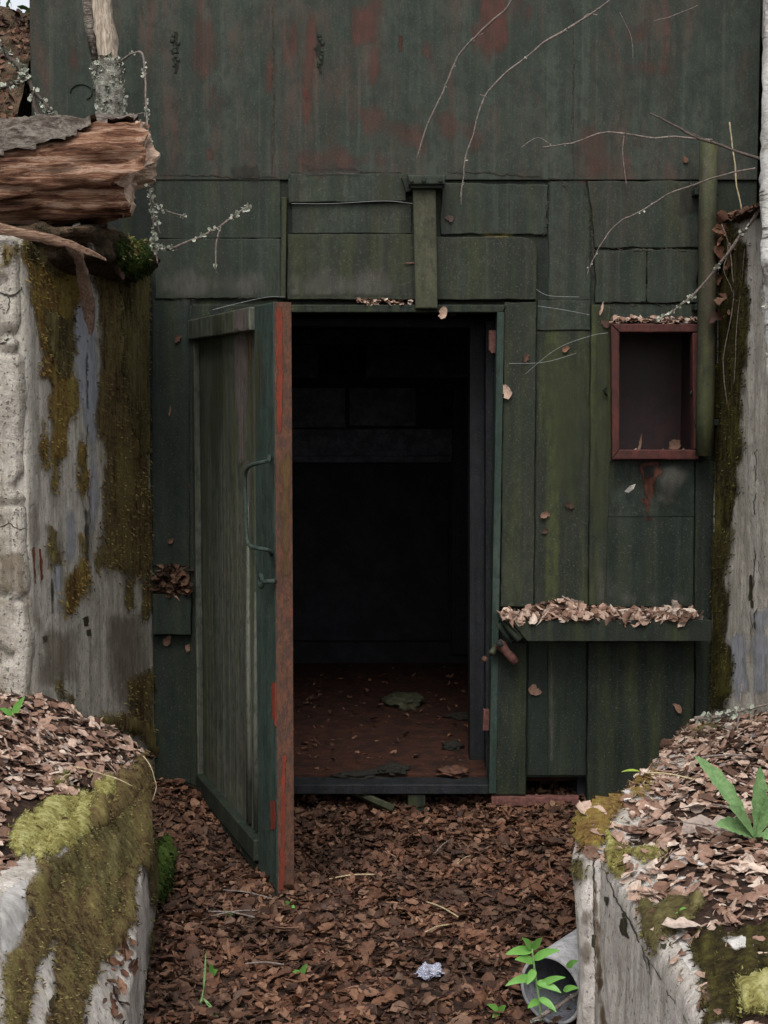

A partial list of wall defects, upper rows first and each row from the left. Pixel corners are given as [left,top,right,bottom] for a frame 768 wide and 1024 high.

leakage [51,302,99,608]
corrosion [280,452,291,575]
leakage [0,879,27,955]
leakage [583,882,609,992]